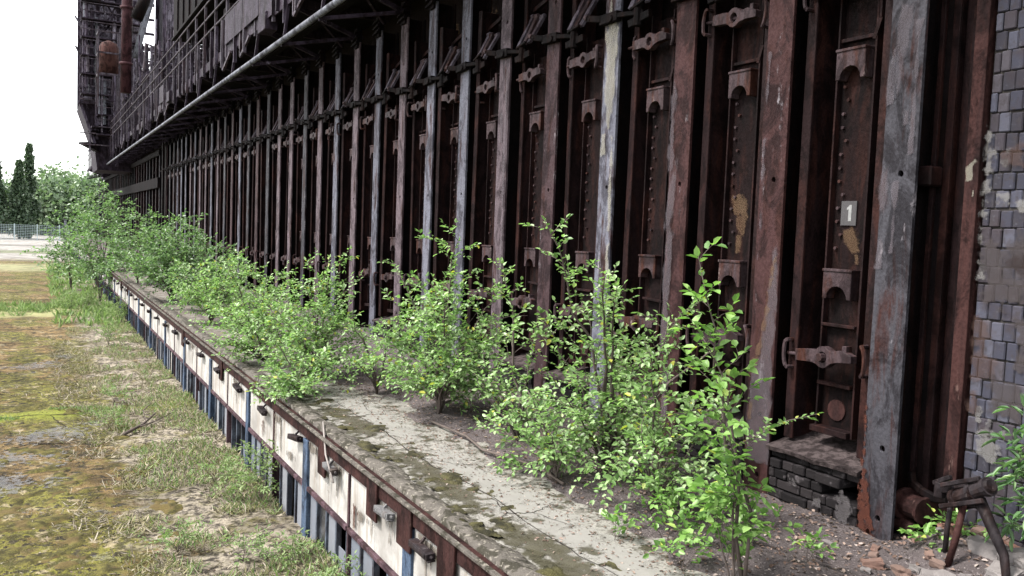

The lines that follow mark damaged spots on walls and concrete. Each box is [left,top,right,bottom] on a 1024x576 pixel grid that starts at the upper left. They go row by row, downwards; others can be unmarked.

rust [857,405,874,536]
damp [418,533,437,576]